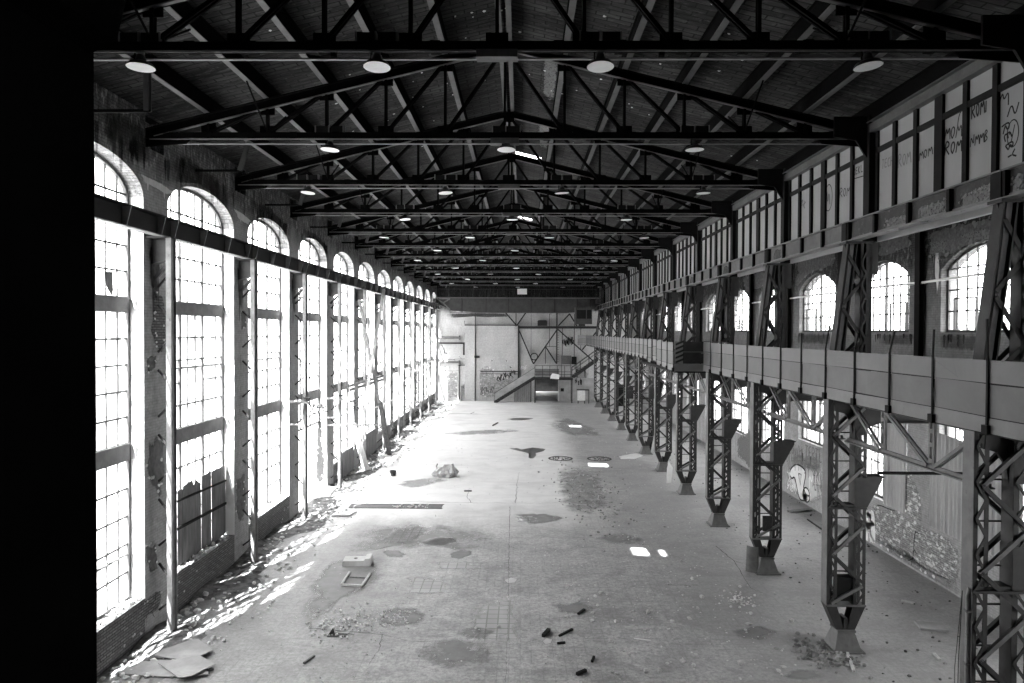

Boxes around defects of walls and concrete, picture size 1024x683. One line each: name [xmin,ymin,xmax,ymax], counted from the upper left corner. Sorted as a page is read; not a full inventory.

leakage [95,113,287,246]
spalling [867,475,959,584]